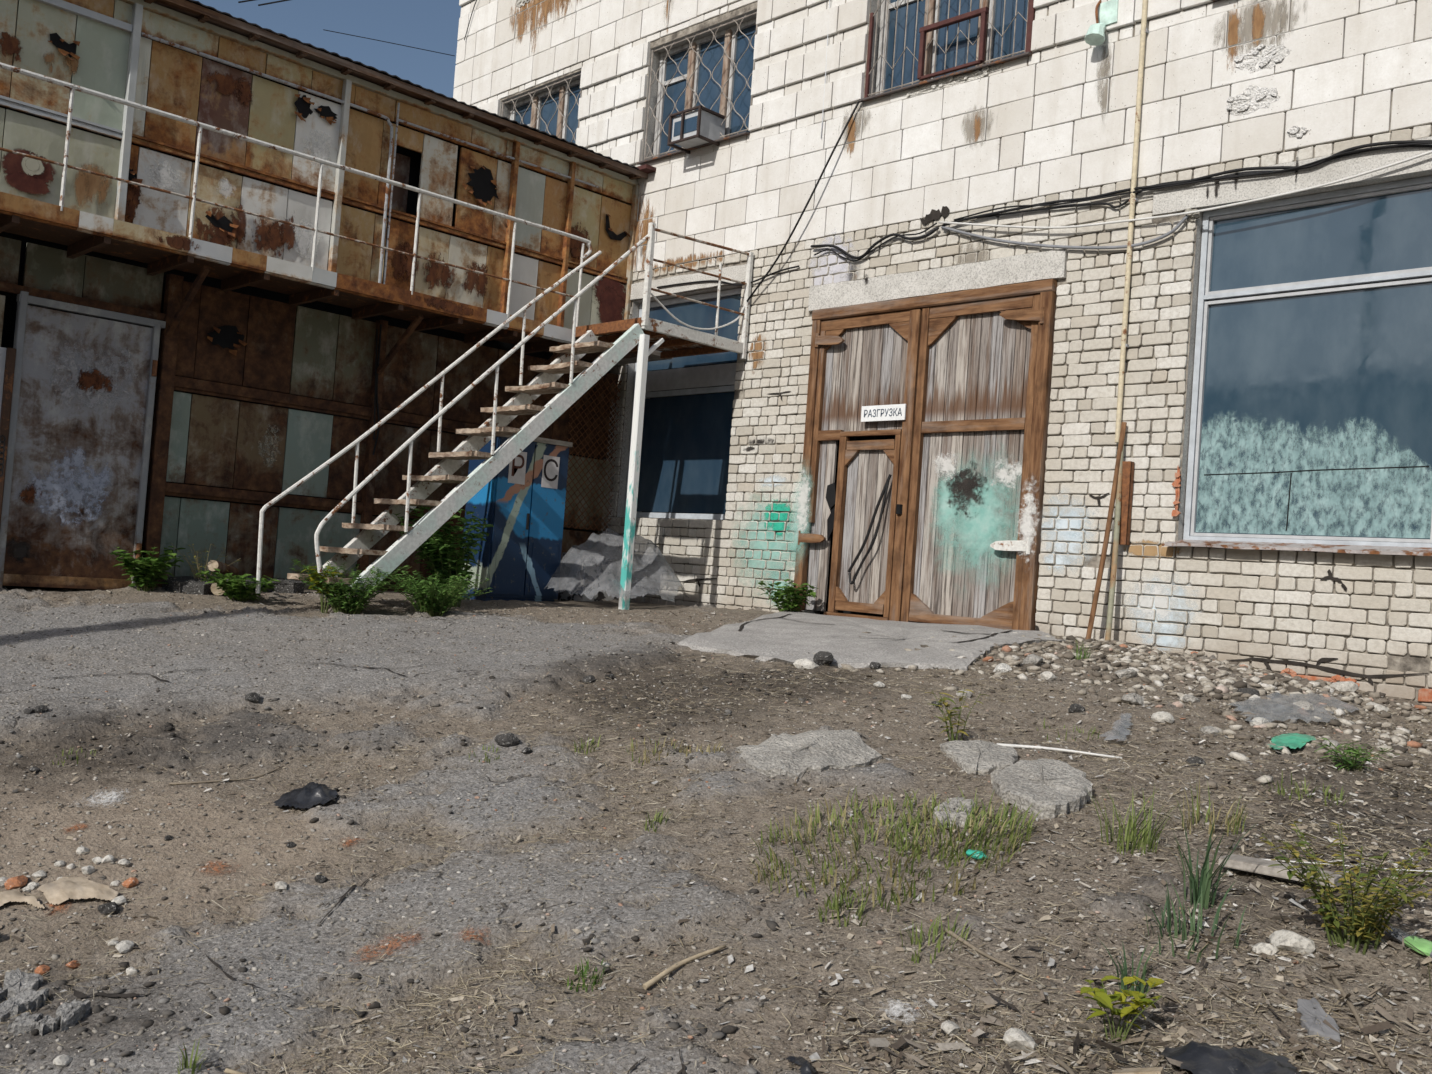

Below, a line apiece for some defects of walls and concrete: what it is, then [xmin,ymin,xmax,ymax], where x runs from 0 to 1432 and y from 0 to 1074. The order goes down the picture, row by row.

rust [511,0,569,48]
peeling [219,179,235,197]
rust [157,204,296,256]
rust [388,242,488,315]
rust [71,369,113,393]
rust [20,485,42,504]